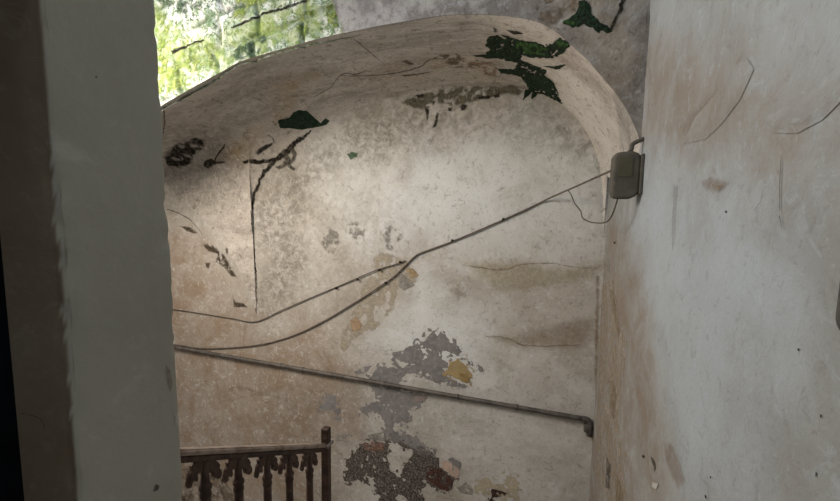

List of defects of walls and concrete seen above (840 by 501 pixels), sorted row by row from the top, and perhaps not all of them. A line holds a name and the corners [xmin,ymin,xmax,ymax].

peeling [442,54,478,68]
crack [243,130,311,225]
crack [251,246,259,311]
peeling [341,226,418,351]
spalling [342,327,523,501]